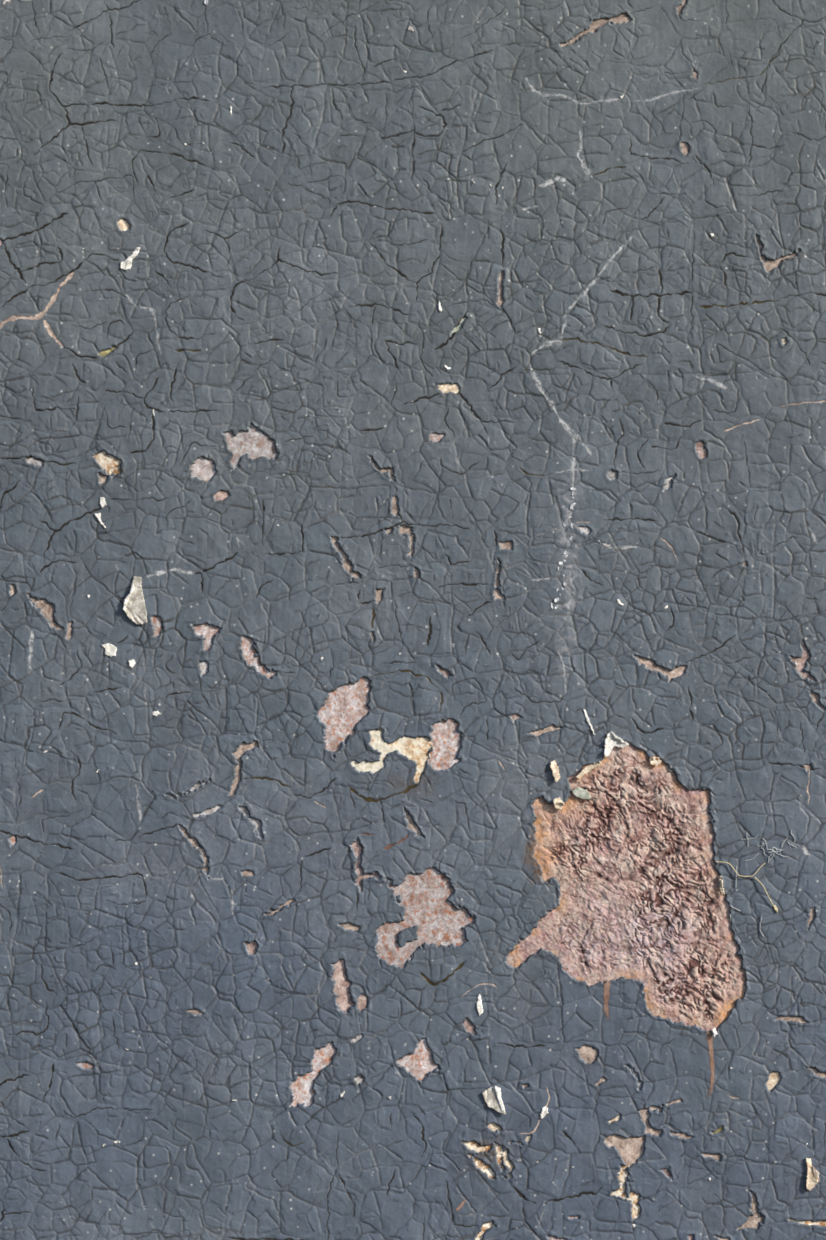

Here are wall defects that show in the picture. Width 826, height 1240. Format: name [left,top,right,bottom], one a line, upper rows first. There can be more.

crack [0,0,565,770]
crack [0,652,147,905]
peeling [319,677,370,758]
crack [245,769,472,850]
peeling [351,719,461,783]
crack [632,635,824,804]
peeling [352,840,474,968]
rust [507,731,746,1092]
crack [0,1064,152,1172]
peeling [290,1042,336,1106]
peeling [397,1038,440,1081]
peeling [605,1099,692,1219]